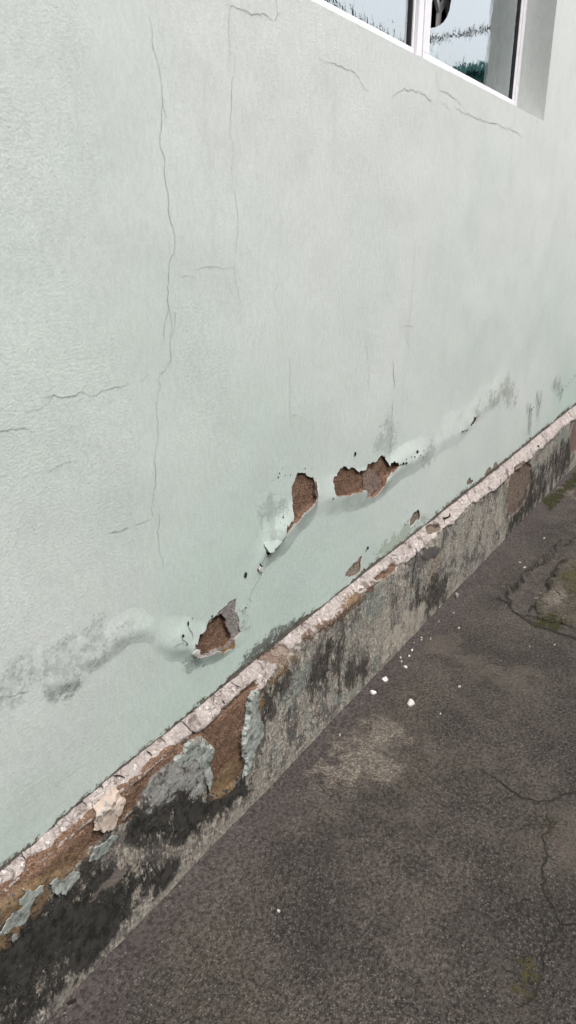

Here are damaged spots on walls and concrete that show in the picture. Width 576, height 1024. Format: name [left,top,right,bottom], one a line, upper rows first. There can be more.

crack [2,20,241,565]
spalling [257,472,320,572]
spalling [345,546,369,590]
spalling [333,455,399,498]
spalling [192,599,241,658]
spalling [0,682,264,942]